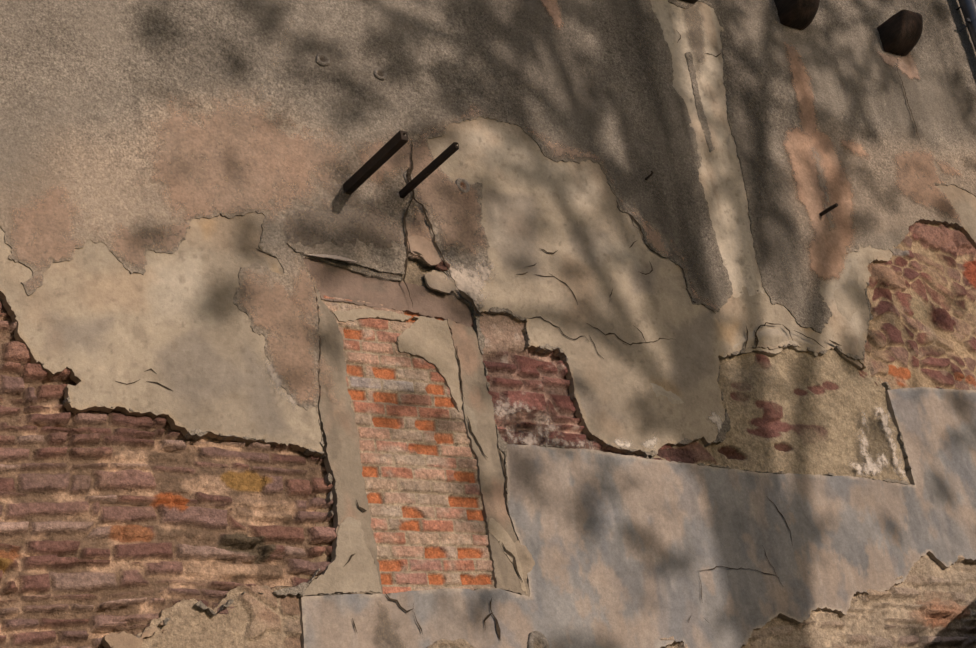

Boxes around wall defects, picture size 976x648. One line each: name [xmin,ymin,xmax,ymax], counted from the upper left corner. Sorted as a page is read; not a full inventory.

peeling [362,142,383,163]
crack [519,249,672,359]
crack [616,201,716,314]
peeling [372,108,976,485]
spalling [0,212,337,648]
peeling [486,518,528,594]
spalling [660,636,688,648]
spalling [741,554,976,648]